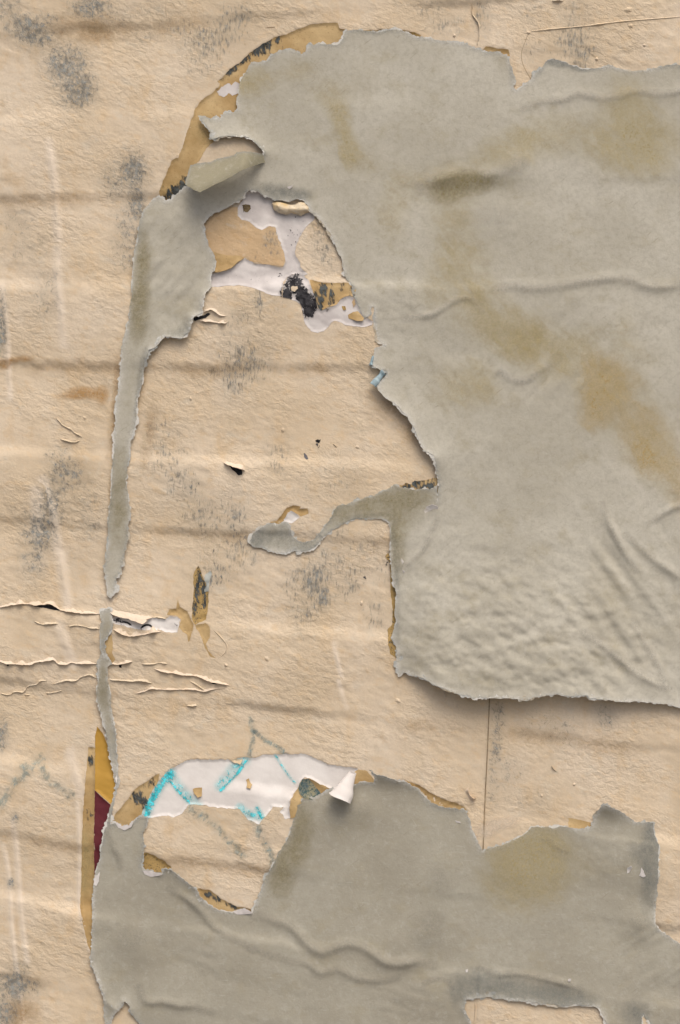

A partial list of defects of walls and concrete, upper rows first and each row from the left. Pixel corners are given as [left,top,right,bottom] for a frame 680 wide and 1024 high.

peeling [159,23,345,200]
peeling [211,191,373,333]
peeling [113,753,374,826]
peeling [407,781,468,823]
peeling [80,747,95,951]
peeling [142,853,171,873]
peeling [197,888,251,912]